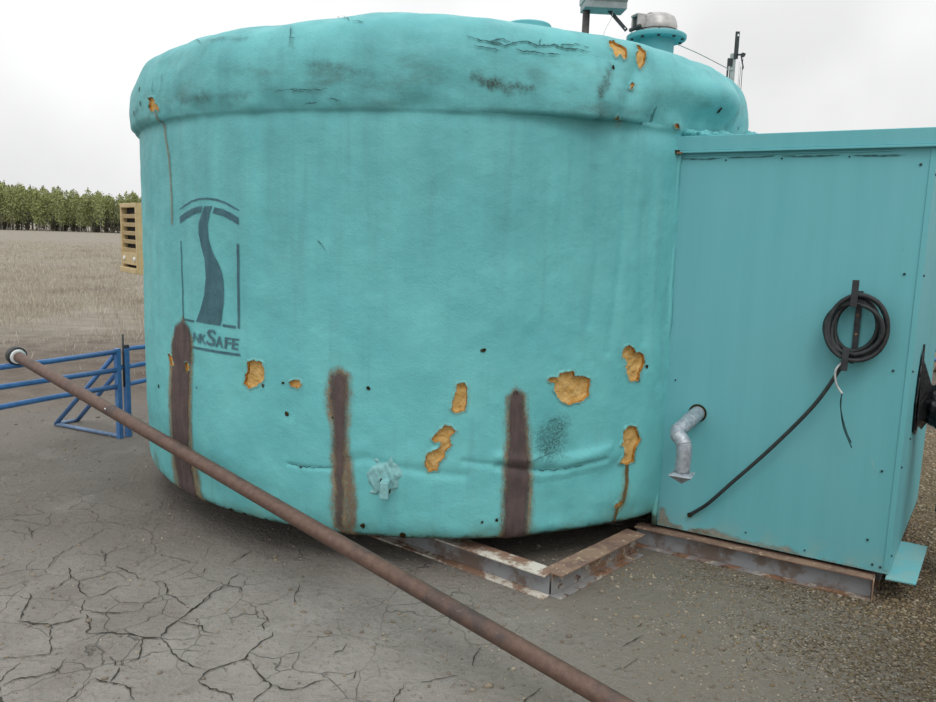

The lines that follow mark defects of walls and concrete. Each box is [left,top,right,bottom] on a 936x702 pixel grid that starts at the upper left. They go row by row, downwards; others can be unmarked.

crack [467,35,590,55]
spalling [606,40,648,72]
corrosion [168,319,192,449]
spalling [243,358,267,391]
spalling [546,369,592,407]
spalling [620,343,648,383]
corrosion [172,456,204,499]
corrosion [326,369,356,535]
spalling [422,380,470,474]
corrosion [499,390,533,538]
spalling [617,423,642,467]
crack [0,532,322,702]